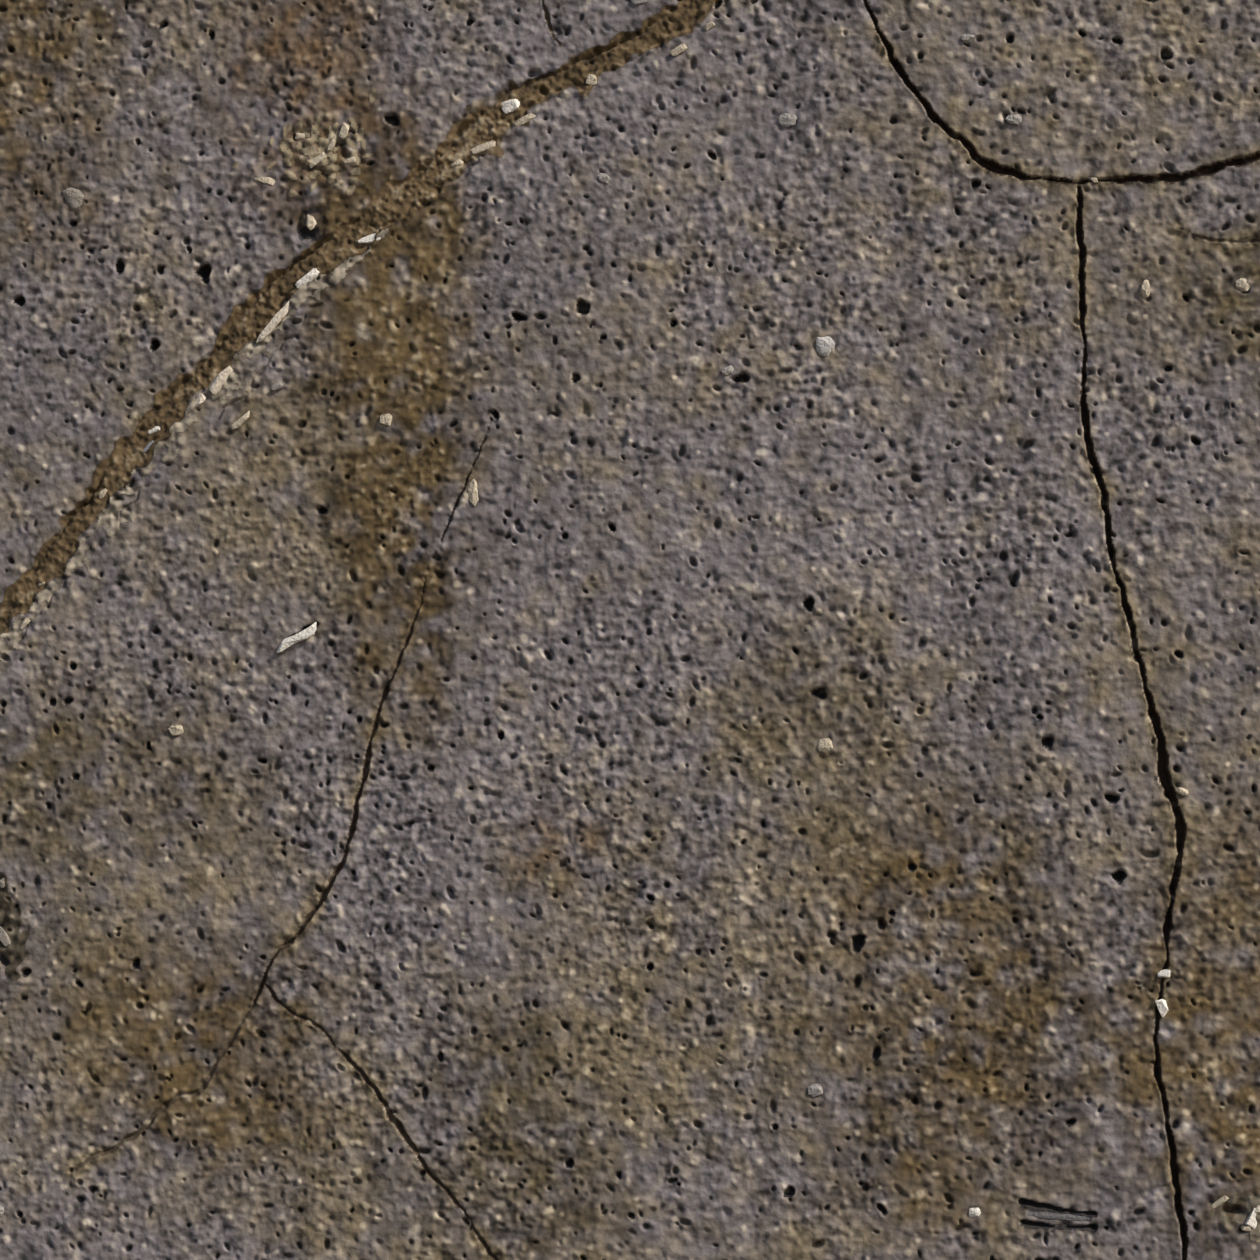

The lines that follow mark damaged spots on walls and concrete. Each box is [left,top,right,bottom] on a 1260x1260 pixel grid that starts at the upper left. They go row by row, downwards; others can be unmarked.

crack [74,580,498,1260]
crack [0,0,719,660]
crack [864,0,1260,1260]